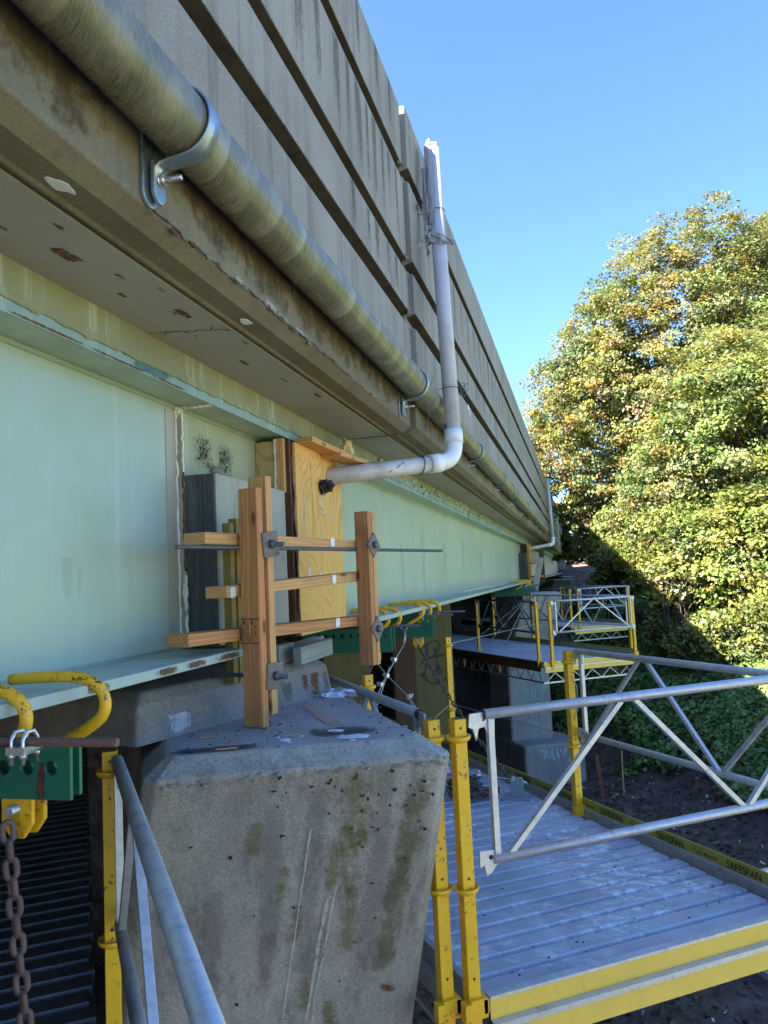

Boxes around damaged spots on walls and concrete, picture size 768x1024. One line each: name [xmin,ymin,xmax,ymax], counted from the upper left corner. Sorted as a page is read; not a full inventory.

corrosion [51,248,81,262]
peeling [0,285,309,437]
leakage [281,828,312,1024]
leakage [304,886,338,1024]